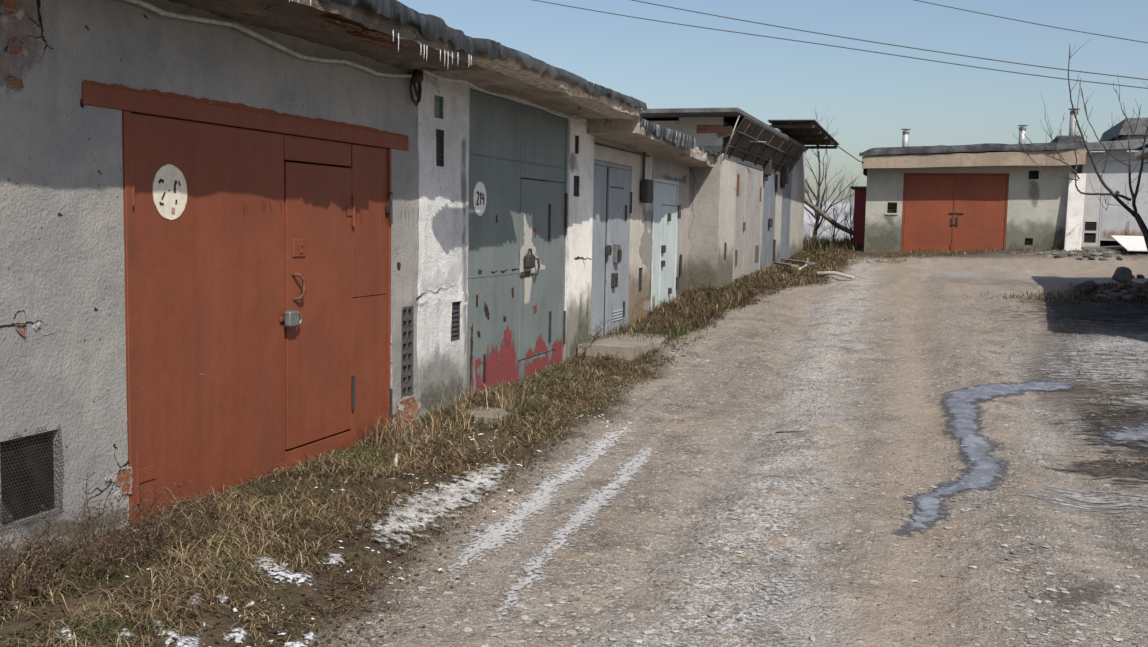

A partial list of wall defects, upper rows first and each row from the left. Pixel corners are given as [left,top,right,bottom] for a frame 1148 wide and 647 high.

crack [25,0,54,61]
peeling [390,325,563,431]
flaking render [105,467,133,500]